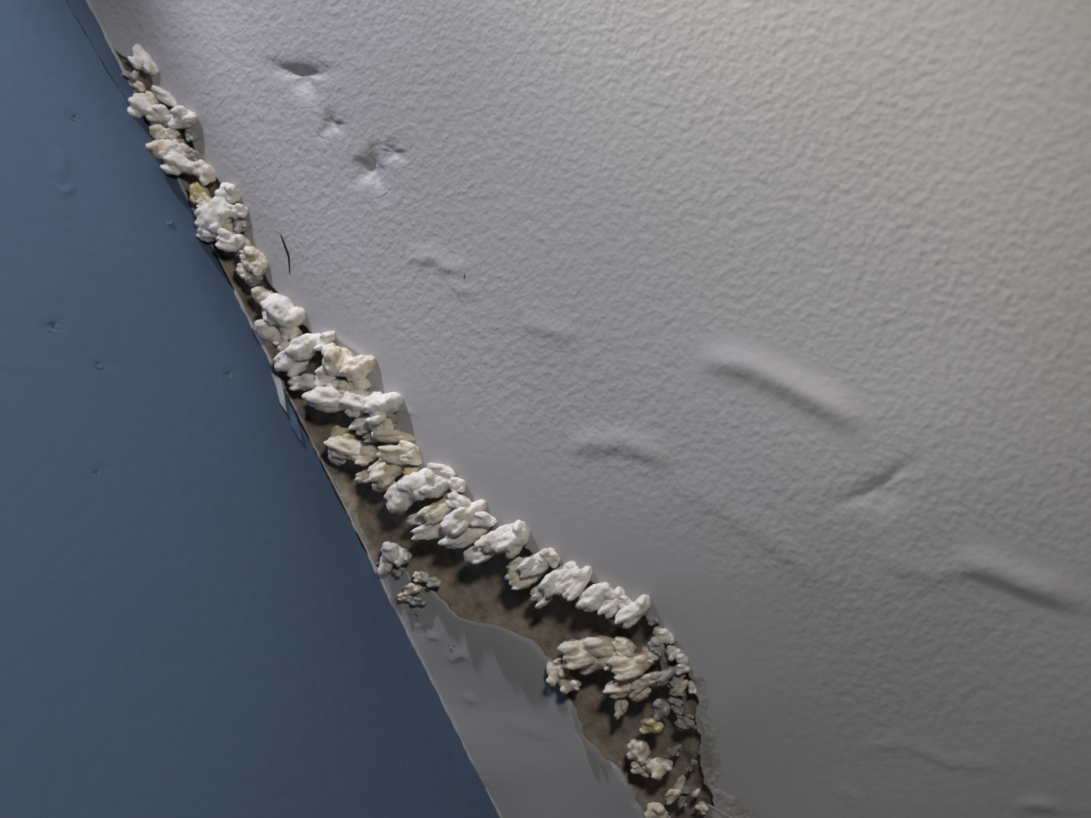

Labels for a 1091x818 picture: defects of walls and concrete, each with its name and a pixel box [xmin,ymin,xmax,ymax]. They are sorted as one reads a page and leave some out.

crack [216,255,234,290]
crack [315,324,419,419]
water stain [127,44,697,780]
crack [286,394,368,555]
water stain [644,788,682,818]